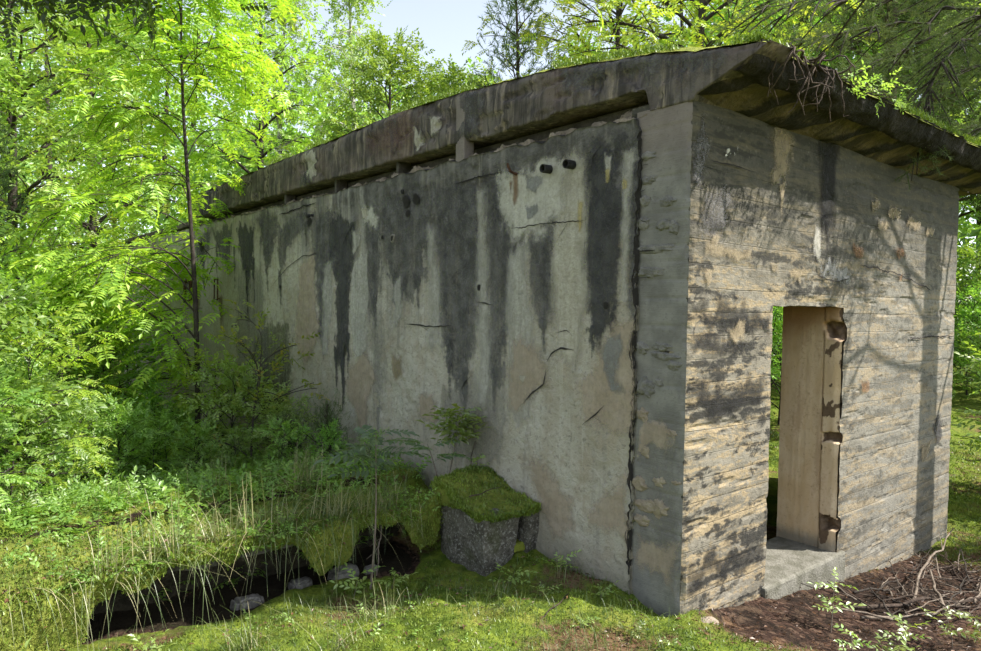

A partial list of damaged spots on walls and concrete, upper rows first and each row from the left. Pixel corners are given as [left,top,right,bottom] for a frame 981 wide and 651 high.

leakage [814,140,850,283]
leakage [196,134,640,457]
crack [409,323,451,331]
crack [524,330,572,402]
crack [625,131,653,575]